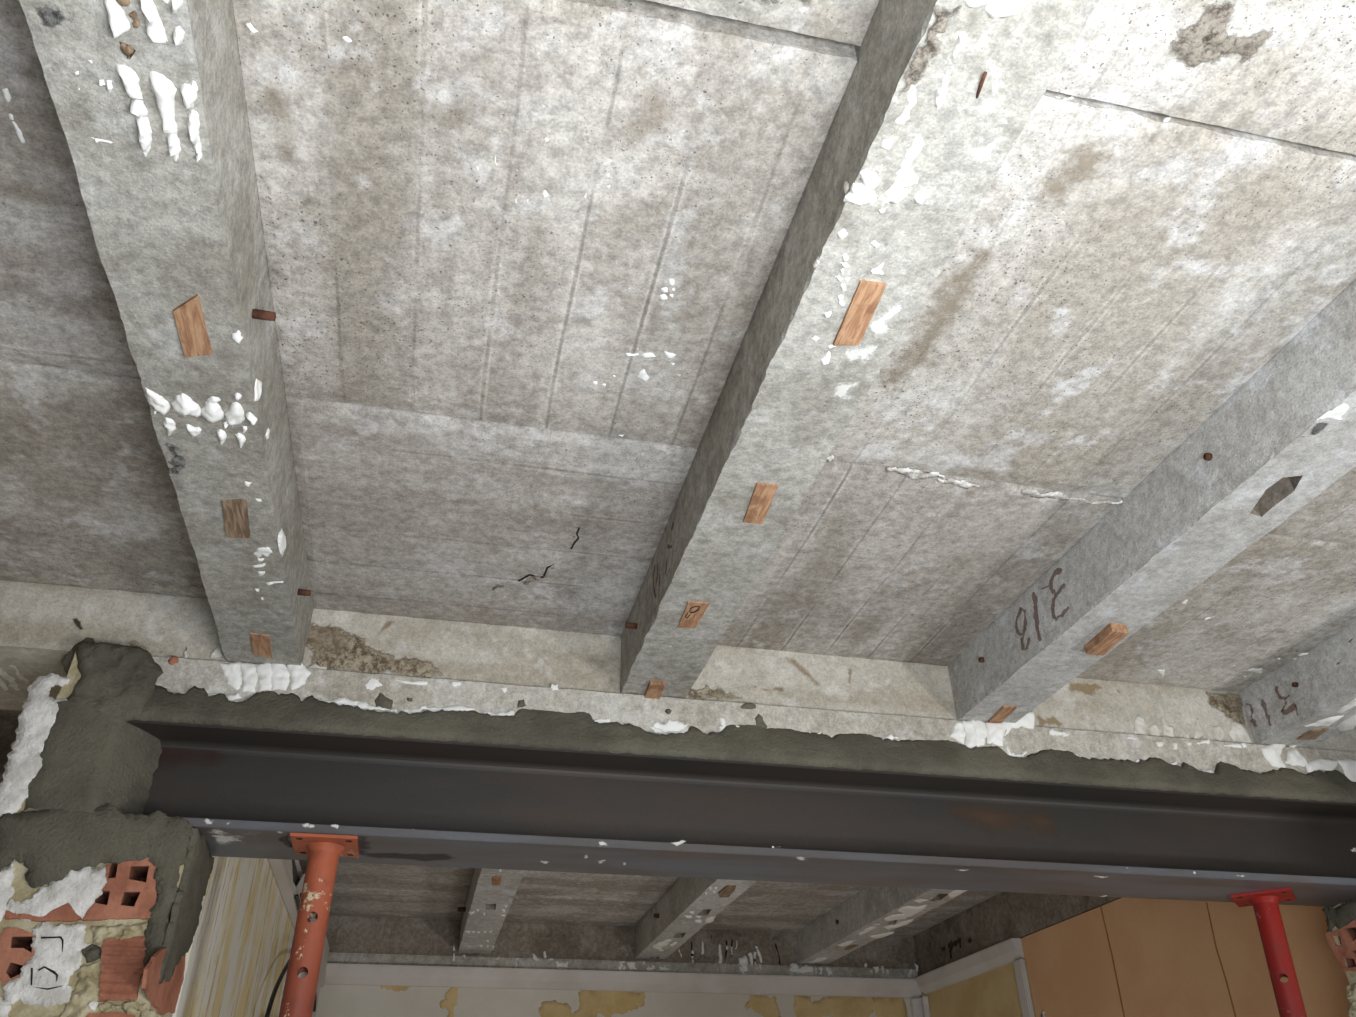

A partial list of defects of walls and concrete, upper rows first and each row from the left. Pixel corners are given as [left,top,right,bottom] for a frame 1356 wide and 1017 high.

spalling [1171,2,1273,67]
crack [518,527,580,582]
spalling [168,647,189,665]
spalling [306,624,515,716]
spalling [687,686,741,700]
spalling [1206,692,1245,725]
peeling [650,719,689,733]
peeling [538,990,645,1017]
peeling [745,994,907,1017]